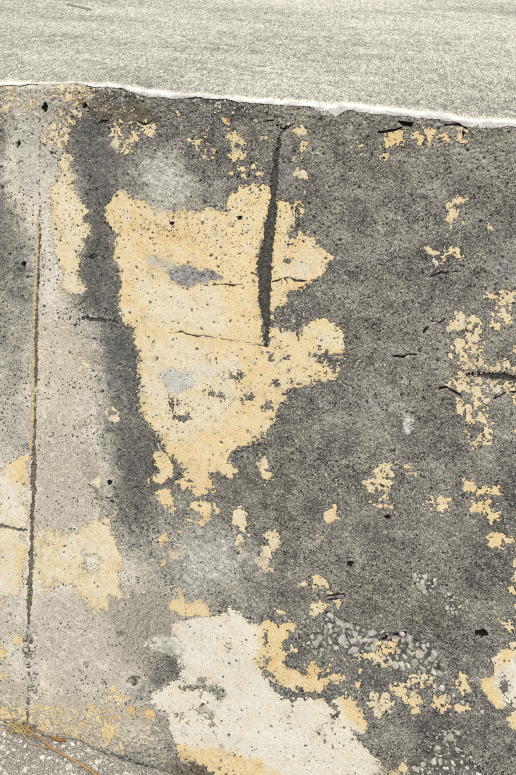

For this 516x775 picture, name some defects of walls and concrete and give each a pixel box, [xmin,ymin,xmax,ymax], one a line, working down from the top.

peeling [103,94,361,527]
crack [256,120,320,347]
peeling [444,286,516,451]
peeling [0,452,126,614]
peeling [0,477,516,775]
peeling [362,462,417,514]